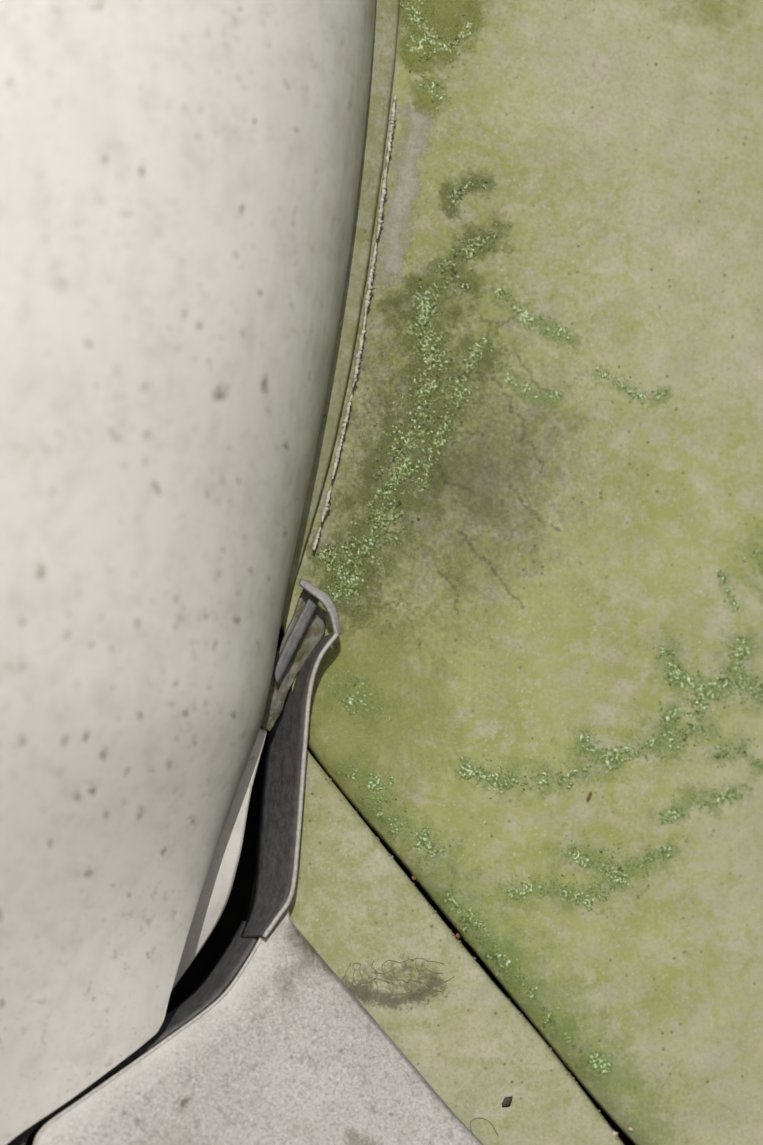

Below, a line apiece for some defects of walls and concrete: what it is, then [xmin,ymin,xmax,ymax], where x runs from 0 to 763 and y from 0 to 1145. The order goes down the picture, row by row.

damp [373,102,433,285]